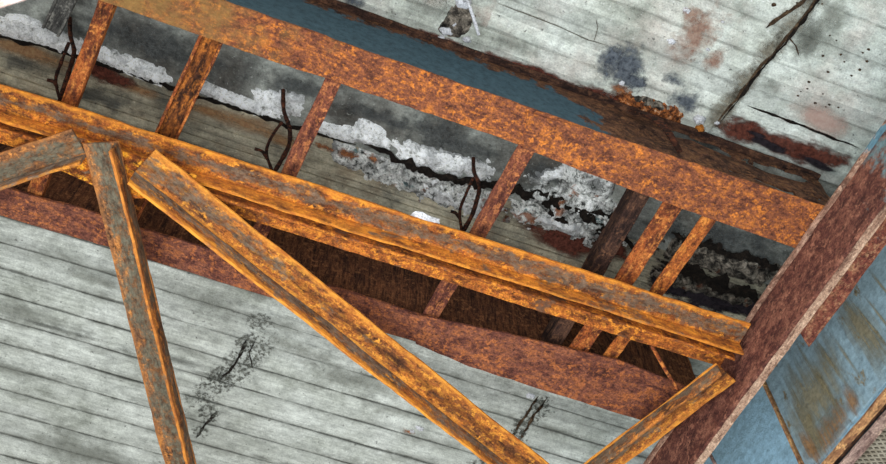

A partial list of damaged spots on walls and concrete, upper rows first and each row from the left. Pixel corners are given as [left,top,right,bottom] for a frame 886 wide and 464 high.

spalling [438,0,476,43]
corrosion [667,7,725,67]
corrosion [91,65,152,95]
corrosion [486,52,684,123]
leakage [597,47,646,88]
leakage [664,76,720,132]
crack [711,0,858,148]
corrosion [716,118,850,167]
spalling [330,140,491,218]
spalling [495,163,618,248]
corrosion [525,224,596,258]
spalling [671,242,782,307]